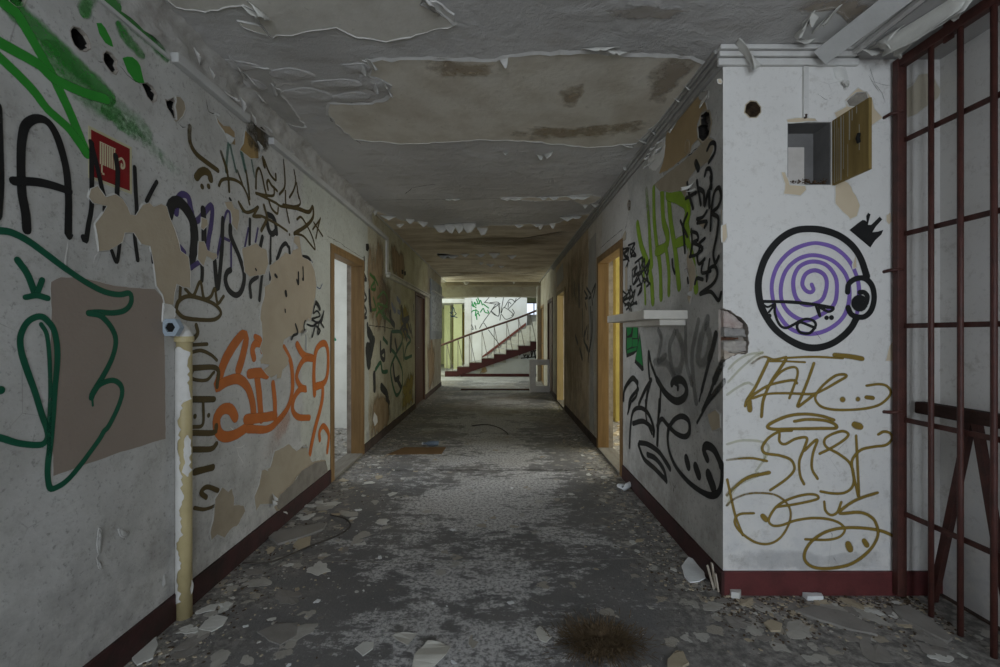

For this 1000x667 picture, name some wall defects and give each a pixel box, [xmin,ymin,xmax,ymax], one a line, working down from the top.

peeling [120,0,602,285]
peeling [326,47,723,197]
peeling [87,185,217,322]
peeling [241,236,317,380]
spalling [721,311,746,360]
peeling [209,443,358,540]